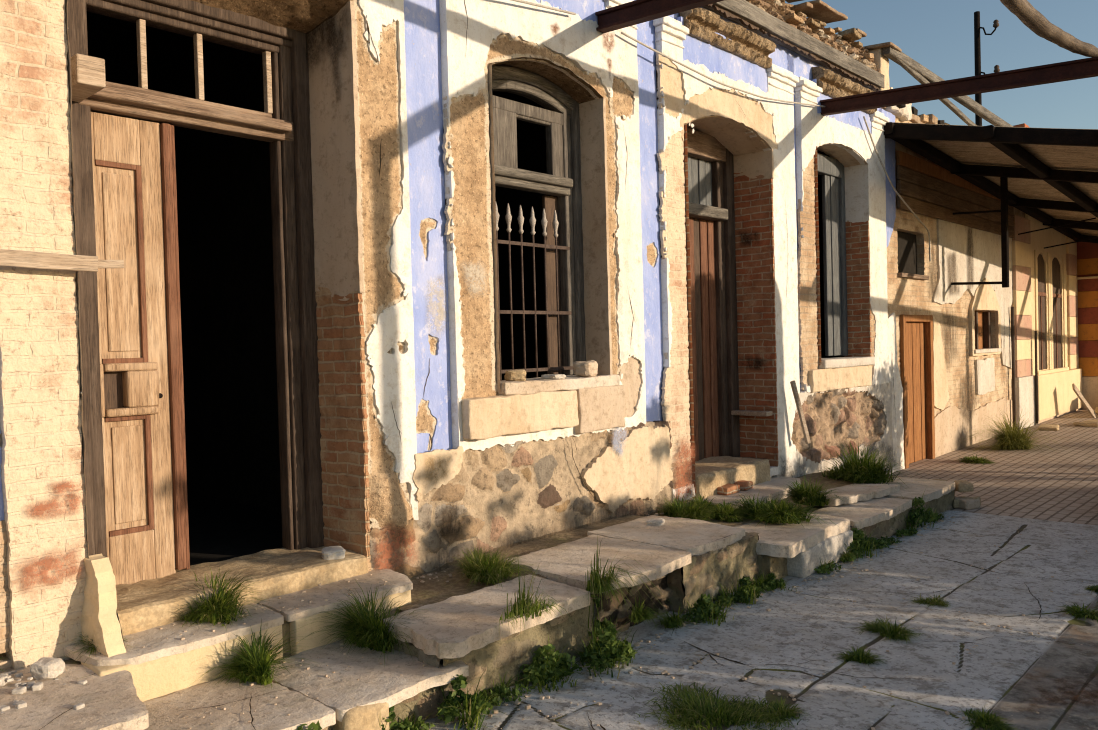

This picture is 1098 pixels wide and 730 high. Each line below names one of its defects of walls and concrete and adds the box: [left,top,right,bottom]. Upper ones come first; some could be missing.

peeling [23,551,78,589]
peeling [28,482,80,516]
spalling [331,0,414,570]
peeling [416,399,437,451]
spalling [419,34,644,418]
spalling [646,53,778,500]
spalling [791,143,888,464]